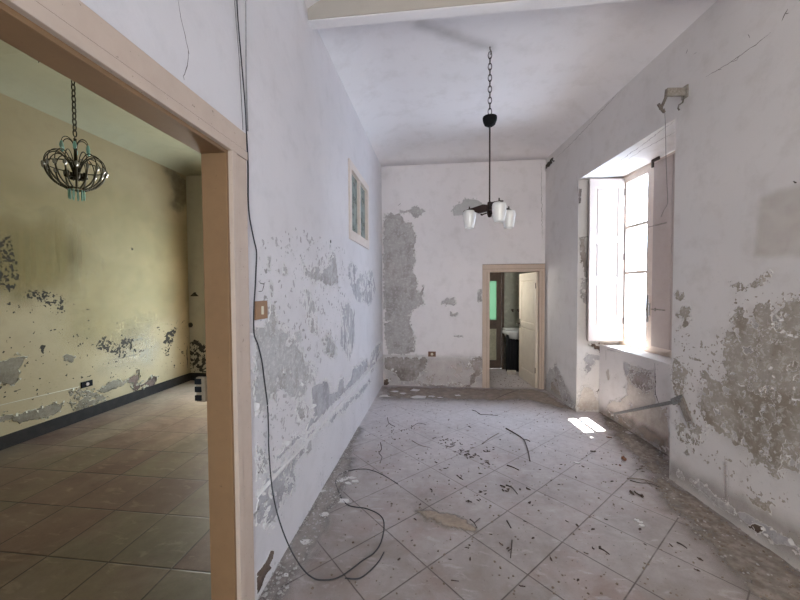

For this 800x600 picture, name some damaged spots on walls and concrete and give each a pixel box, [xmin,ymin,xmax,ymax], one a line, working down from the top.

peeling [0,352,28,386]
peeling [0,369,159,424]
peeling [250,205,482,535]
peeling [545,268,800,516]